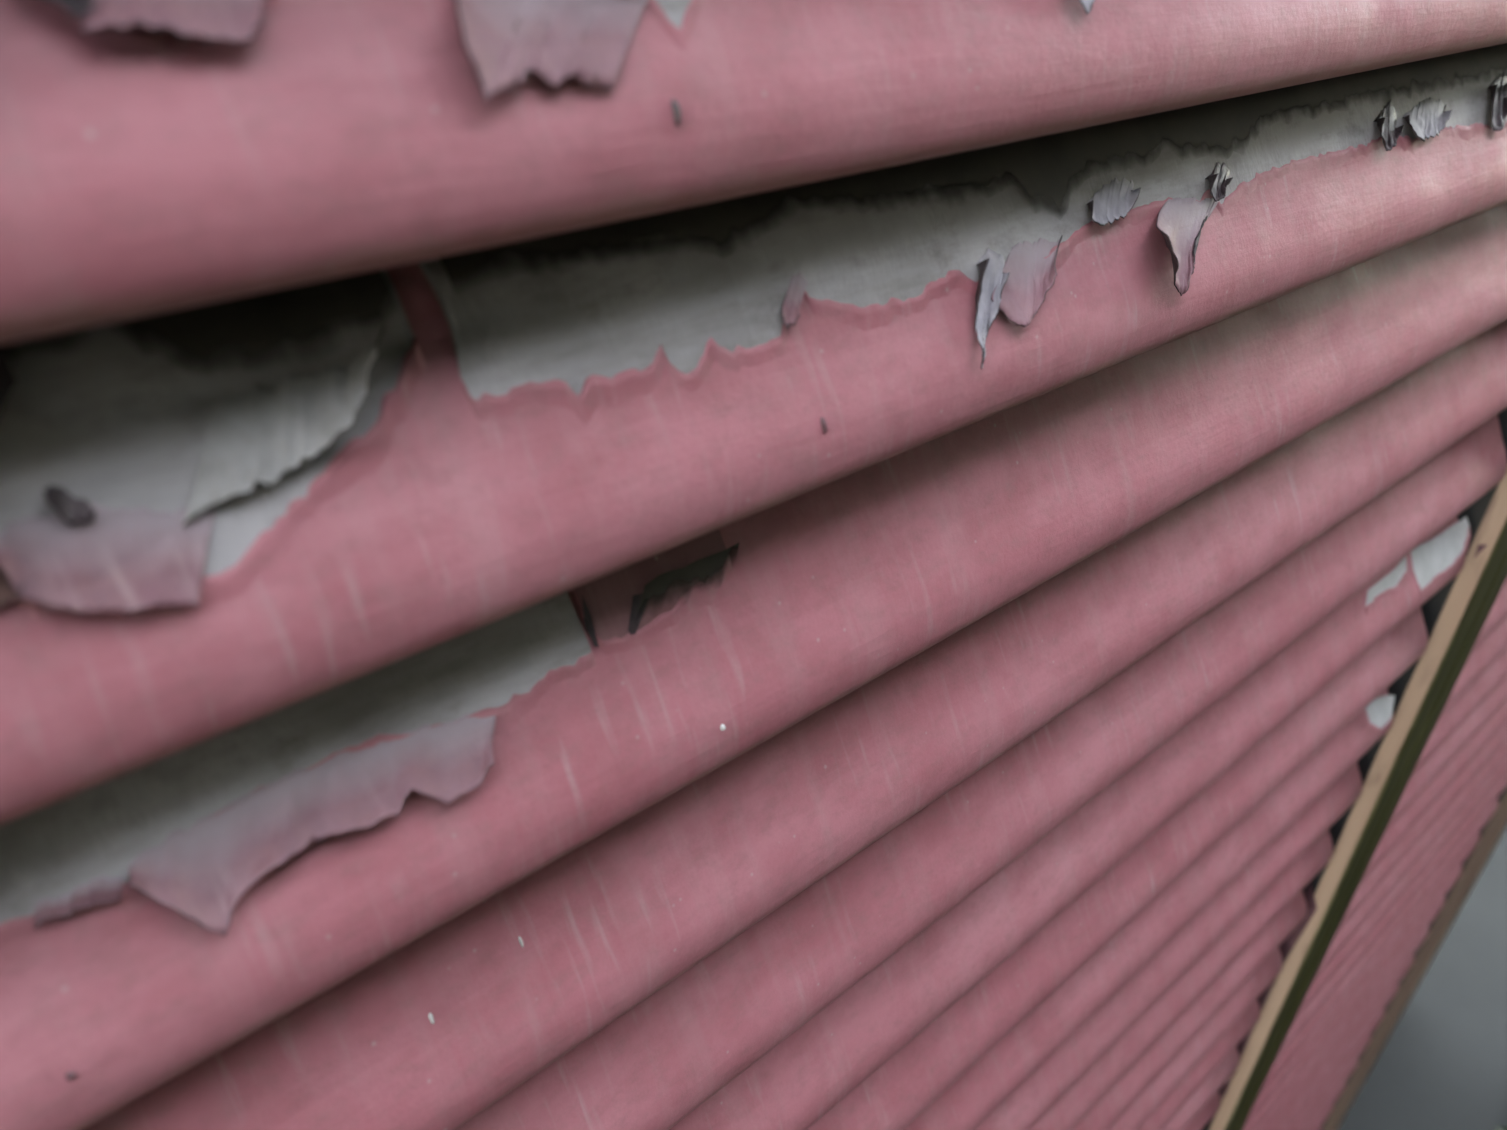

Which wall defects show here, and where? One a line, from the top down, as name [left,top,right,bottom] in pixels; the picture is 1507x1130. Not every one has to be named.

peeling [48,0,279,61]
peeling [454,0,704,103]
peeling [1079,0,1095,14]
peeling [418,43,1507,425]
peeling [0,269,424,626]
peeling [1365,517,1471,615]
peeling [0,529,739,948]
peeling [1365,695,1395,733]